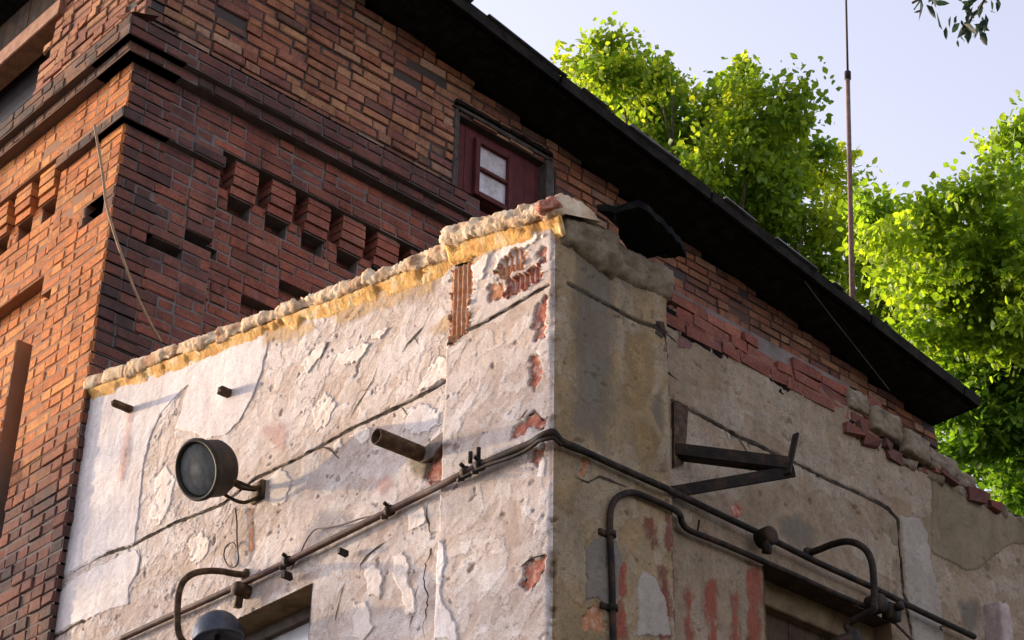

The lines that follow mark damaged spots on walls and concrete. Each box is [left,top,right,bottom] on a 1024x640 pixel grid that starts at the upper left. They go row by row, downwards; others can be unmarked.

flaking render [417,196,565,392]
flaking render [53,331,268,634]
crack [62,366,446,588]
flaking render [267,467,292,506]
flaking render [312,391,337,433]
flaking render [511,409,547,439]
crack [447,285,912,631]
spalling [843,420,904,466]
spalling [919,465,1003,515]
flaking render [521,554,547,592]